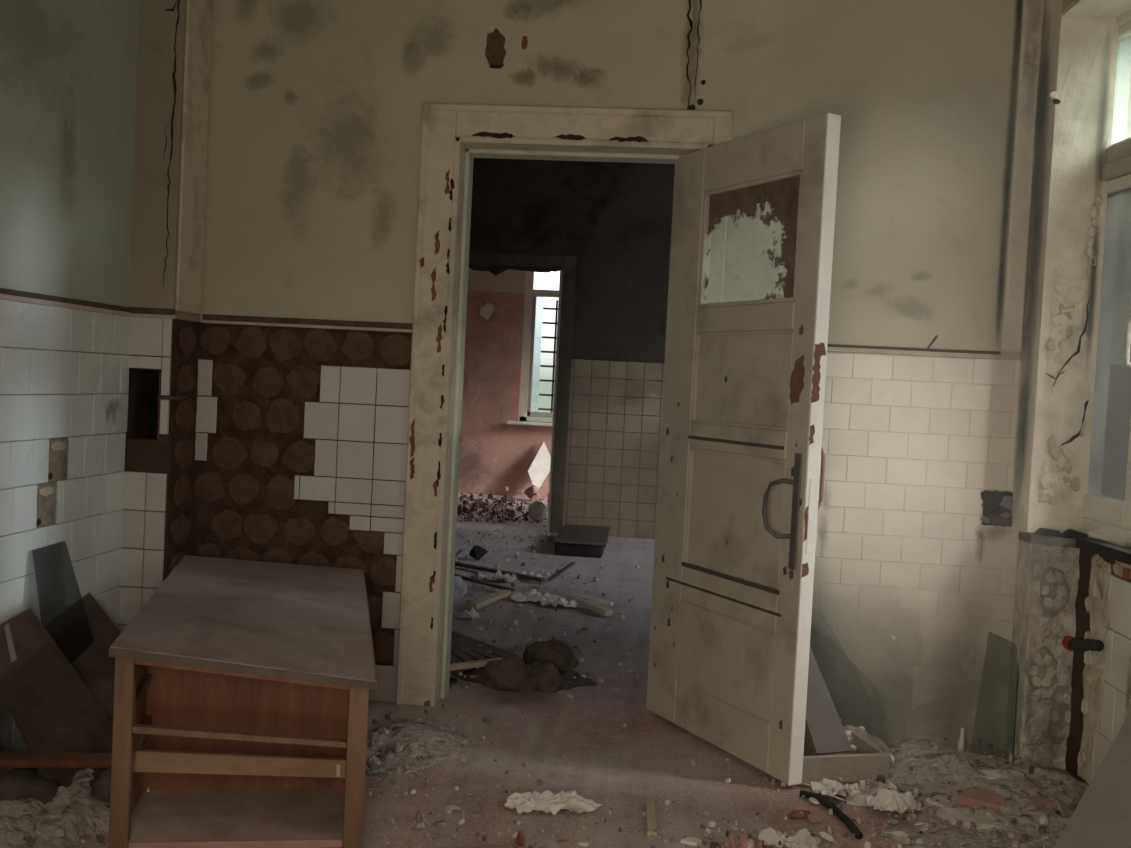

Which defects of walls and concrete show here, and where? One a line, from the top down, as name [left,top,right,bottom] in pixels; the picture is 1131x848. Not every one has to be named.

peeling [485,23,506,69]
crack [163,0,180,286]
peeling [420,230,440,301]
peeling [707,176,800,299]
peeling [1045,195,1102,386]
peeling [36,437,69,526]
peeling [128,319,415,666]
peeling [1038,434,1080,509]
spalling [1024,554,1131,784]